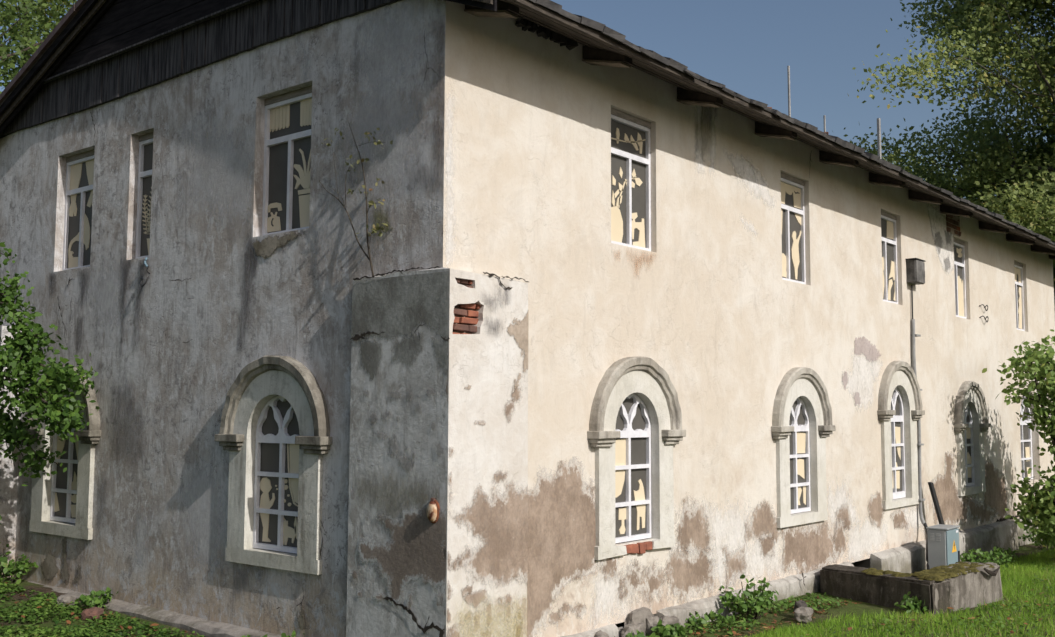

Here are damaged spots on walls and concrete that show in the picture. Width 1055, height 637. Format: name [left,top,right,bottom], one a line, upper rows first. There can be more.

spalling [253,231,306,259]
leakage [81,259,147,320]
crack [351,331,384,341]
spalling [452,303,481,334]
peeling [505,312,529,421]
peeling [854,337,881,362]
peeling [842,372,861,405]
peeling [931,452,1008,525]
peeling [868,492,907,529]
spalling [41,537,81,585]
peeling [352,456,852,637]
crack [383,597,445,637]